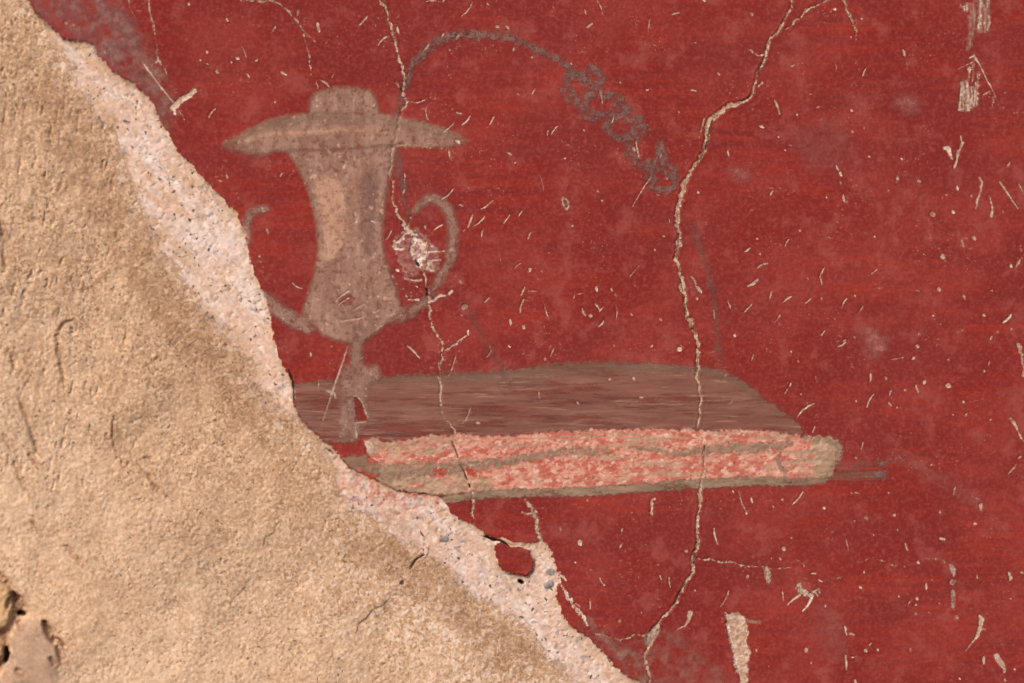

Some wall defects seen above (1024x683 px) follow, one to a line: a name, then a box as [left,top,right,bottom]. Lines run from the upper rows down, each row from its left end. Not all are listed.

crack [379,0,431,238]
peeling [960,0,990,30]
peeling [958,54,995,111]
flaking render [45,22,642,683]
crack [418,266,508,545]
crack [558,0,857,683]
spalling [0,583,26,662]
peeling [720,606,751,683]